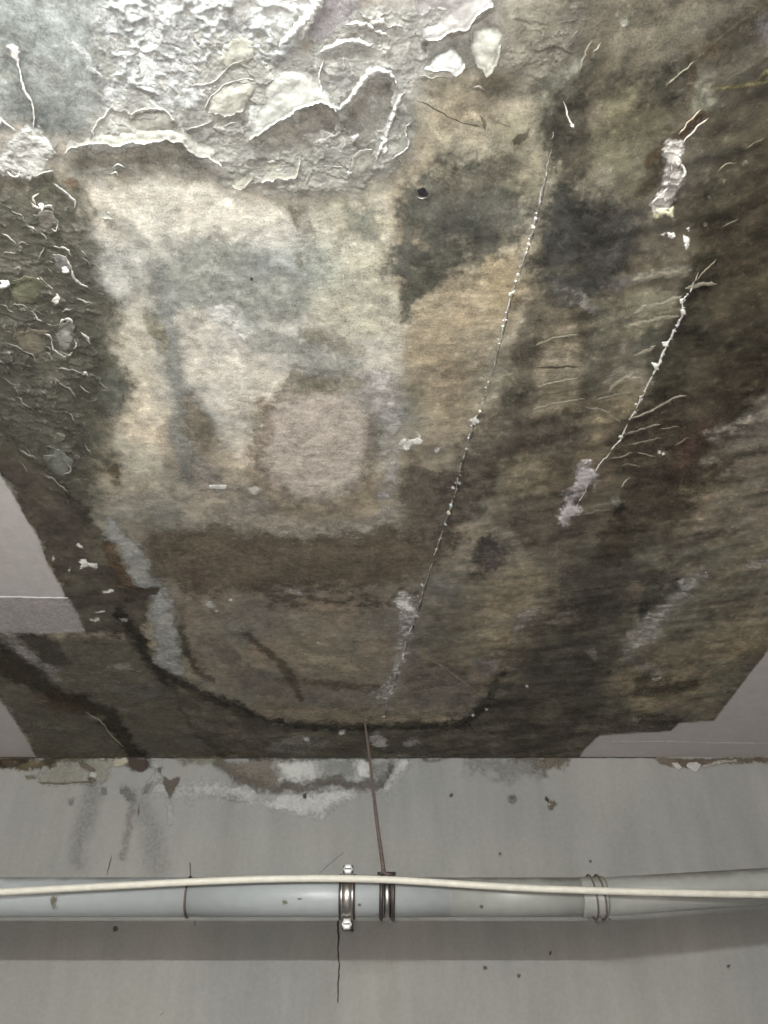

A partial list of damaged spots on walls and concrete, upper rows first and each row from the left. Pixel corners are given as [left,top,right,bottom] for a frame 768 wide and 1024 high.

peeling [0,0,580,494]
water stain [0,0,768,819]
crack [382,127,557,718]
crack [576,261,715,507]
crack [334,920,342,1002]